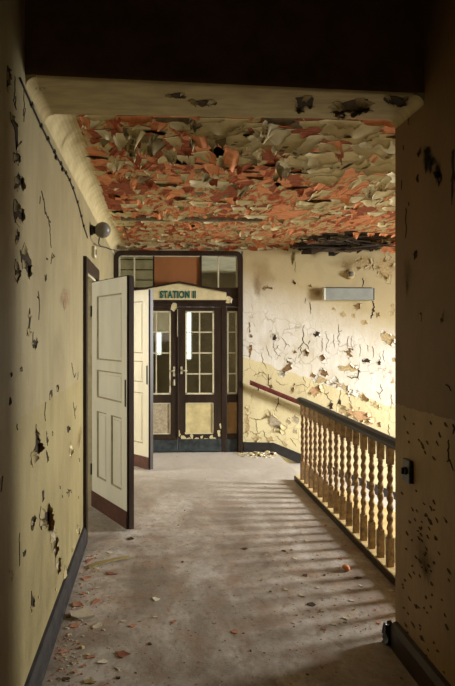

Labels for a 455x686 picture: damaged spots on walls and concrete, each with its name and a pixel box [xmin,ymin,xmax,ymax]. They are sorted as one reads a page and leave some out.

peeling [383,95,408,108]
peeling [79,95,395,251]
peeling [10,112,33,284]
peeling [355,241,395,284]
peeling [278,348,310,378]
crack [254,298,385,407]
peeling [381,330,395,348]
spalling [307,348,382,427]
peeling [31,424,53,467]
spalling [244,405,299,447]
peeling [31,490,67,580]